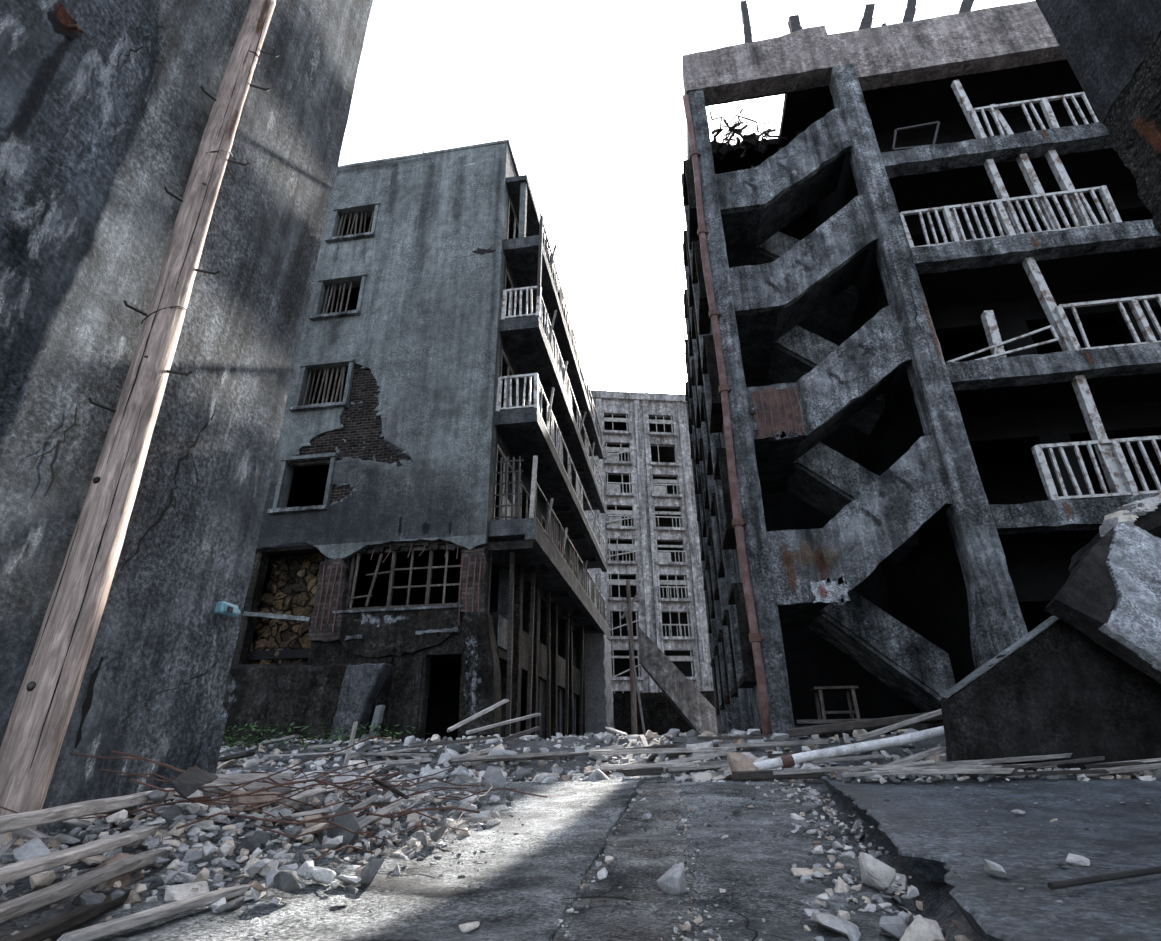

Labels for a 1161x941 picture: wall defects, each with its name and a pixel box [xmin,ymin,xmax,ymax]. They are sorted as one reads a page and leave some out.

crack [32,405,77,497]
crack [120,399,217,571]
spalling [287,364,413,469]
peeling [810,576,855,606]
crack [74,657,104,748]